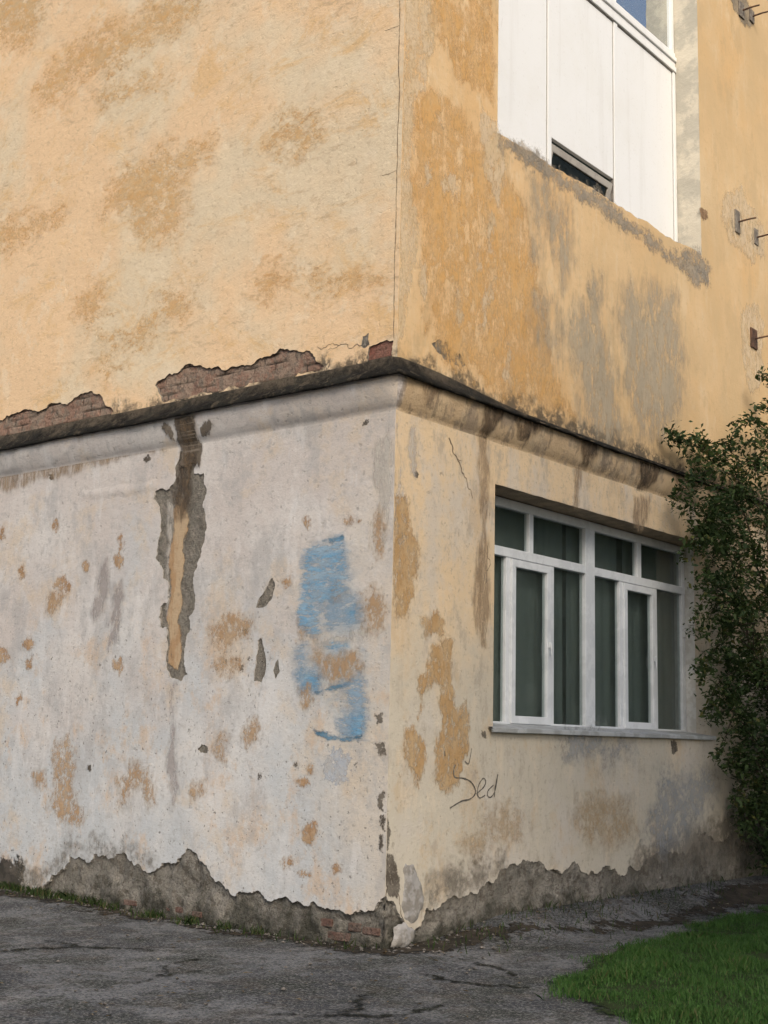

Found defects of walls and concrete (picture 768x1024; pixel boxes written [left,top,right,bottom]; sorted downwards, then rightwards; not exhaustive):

flaking render [0,391,113,437]
flaking render [155,348,324,402]
flaking render [361,333,393,362]
leakage [563,282,682,503]
crack [449,438,473,498]
leakage [633,462,661,529]
flaking render [154,415,212,681]
flaking render [256,578,291,608]
peeling [361,496,420,630]
peeling [211,614,280,682]
peeling [404,611,470,794]
flaking render [42,791,768,949]